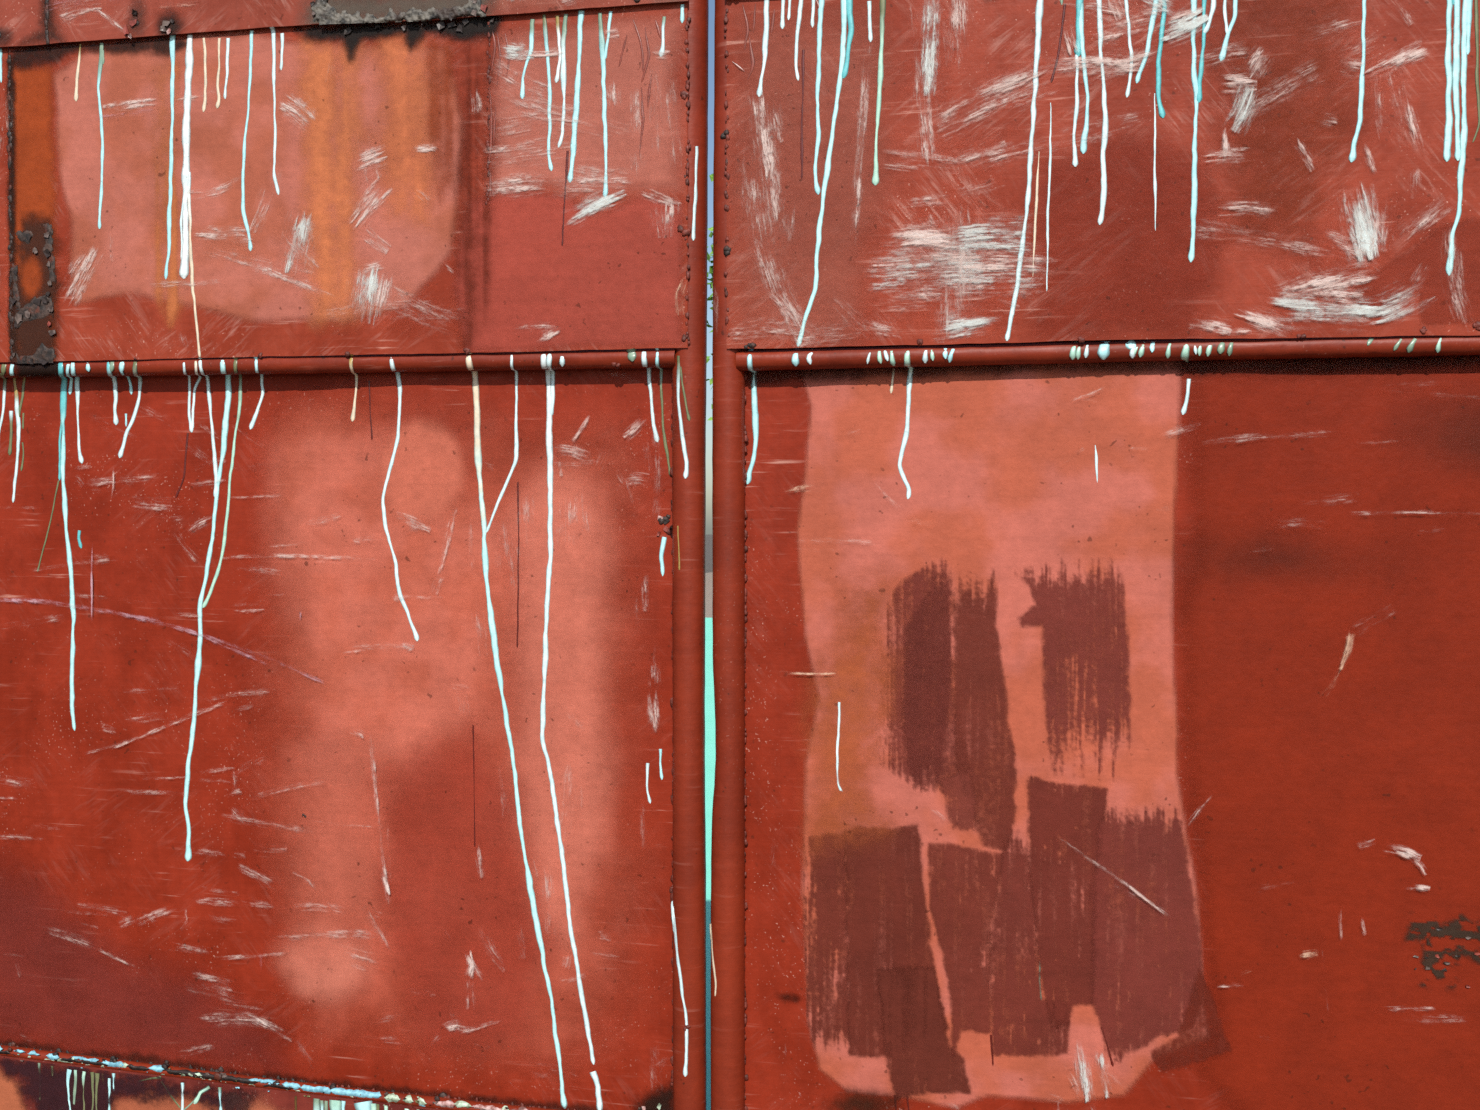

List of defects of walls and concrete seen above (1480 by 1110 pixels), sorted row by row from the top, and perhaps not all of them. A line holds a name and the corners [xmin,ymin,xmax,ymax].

rust [11,67,59,365]
peeling [1407,915,1480,988]